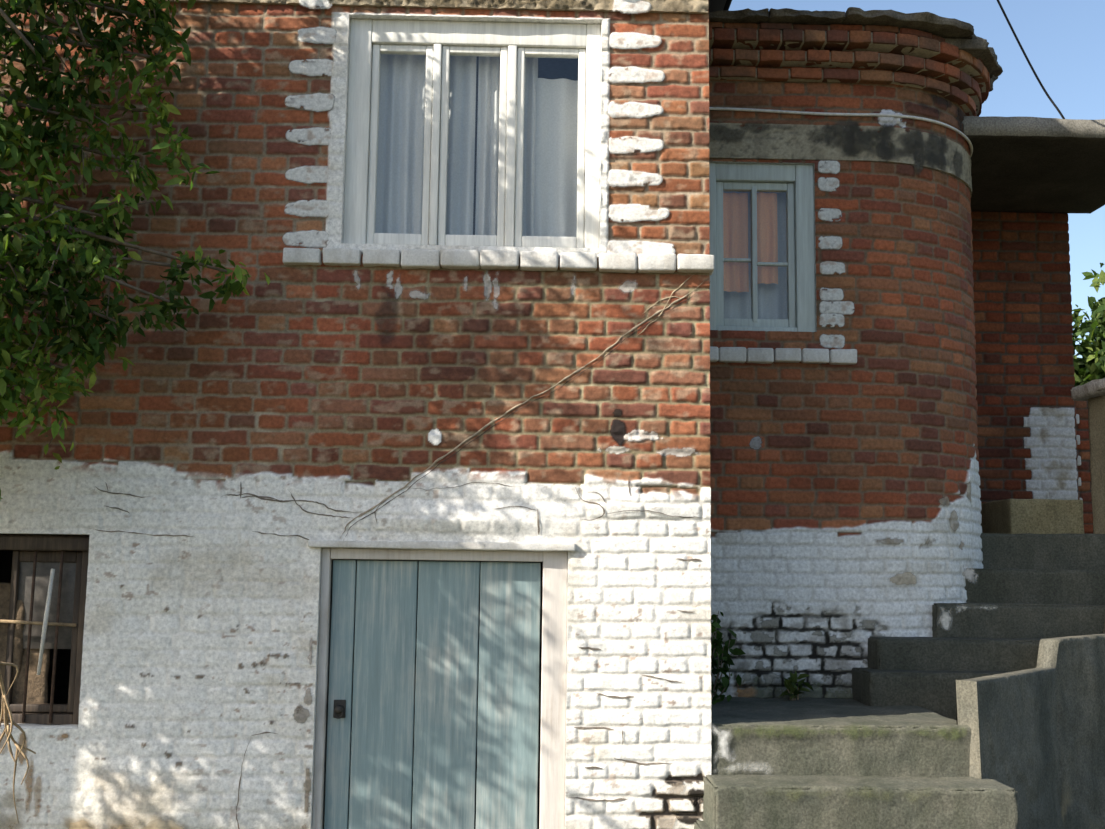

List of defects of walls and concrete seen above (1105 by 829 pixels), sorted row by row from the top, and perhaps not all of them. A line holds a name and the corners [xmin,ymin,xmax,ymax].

water stain [816,120,962,177]
crack [224,274,711,541]
crack [90,484,194,537]
peeling [711,603,887,699]
spalling [639,773,704,829]